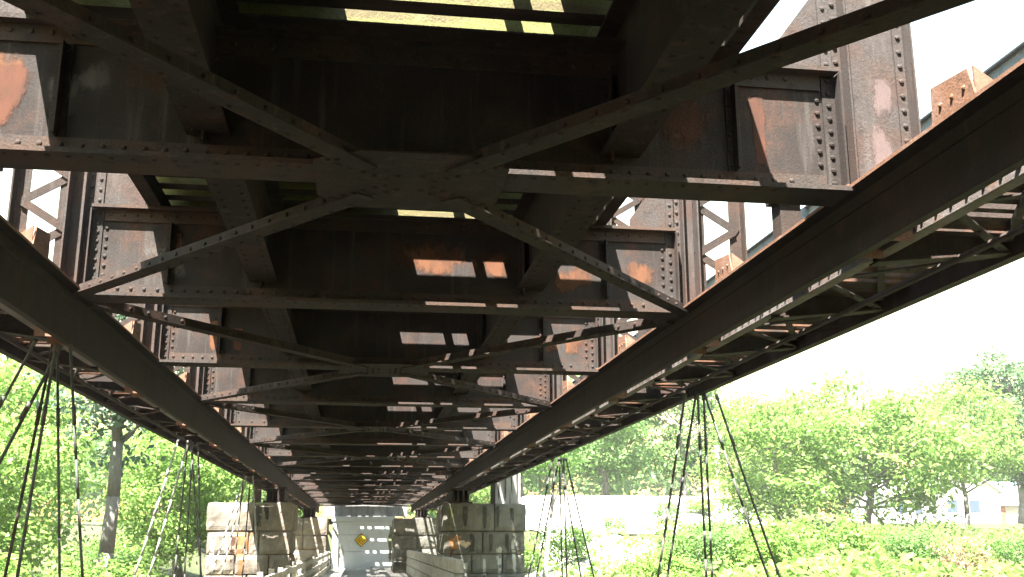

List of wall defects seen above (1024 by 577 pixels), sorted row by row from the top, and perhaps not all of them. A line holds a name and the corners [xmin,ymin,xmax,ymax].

corrosion [0,53,29,125]
corrosion [748,95,767,166]
corrosion [551,268,592,293]
corrosion [627,262,654,283]